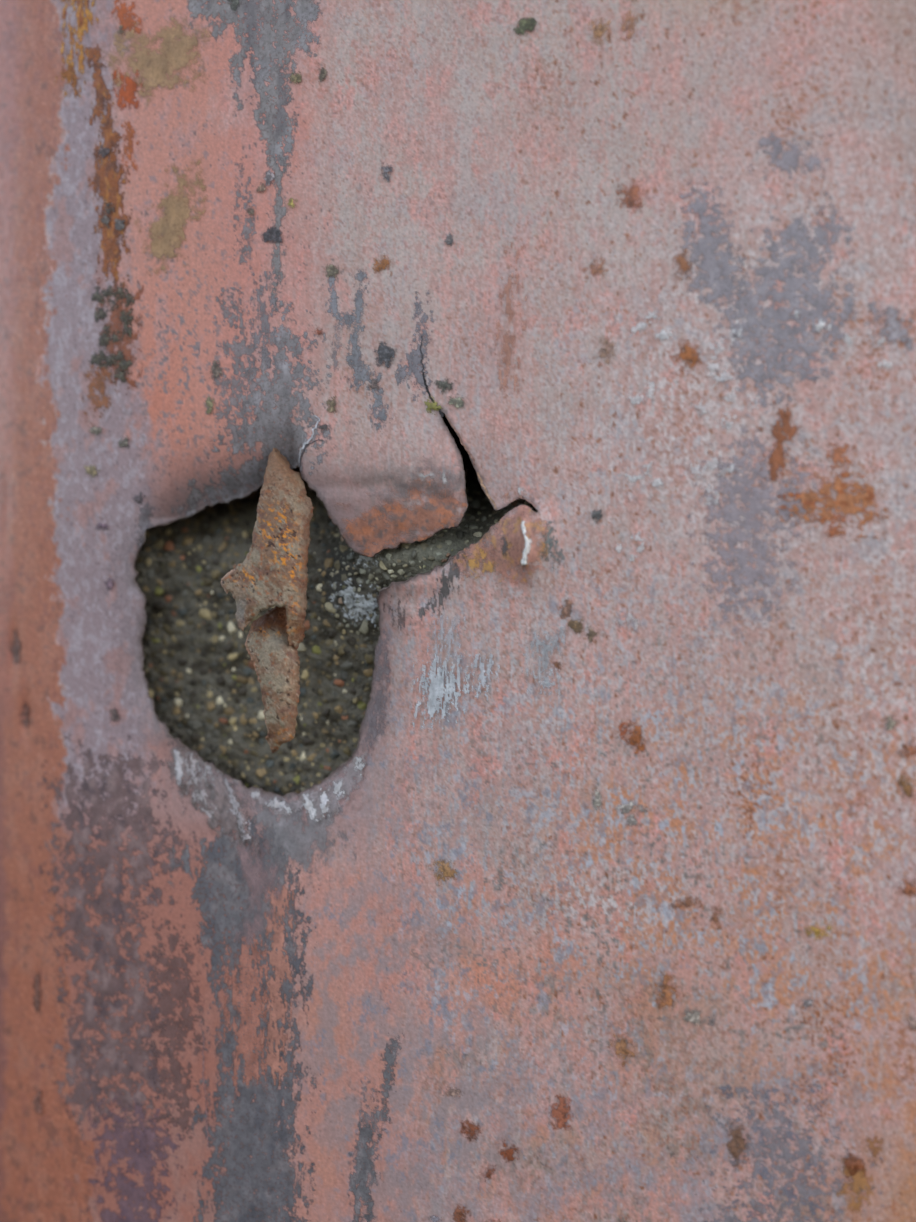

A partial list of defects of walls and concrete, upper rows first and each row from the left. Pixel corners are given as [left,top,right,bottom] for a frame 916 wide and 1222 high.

corrosion [56,0,144,427]
peeling [133,492,155,548]
peeling [171,0,464,516]
crack [420,336,524,515]
peeling [759,127,831,179]
peeling [679,177,913,630]
corrosion [762,400,890,538]
peeling [39,736,347,1222]